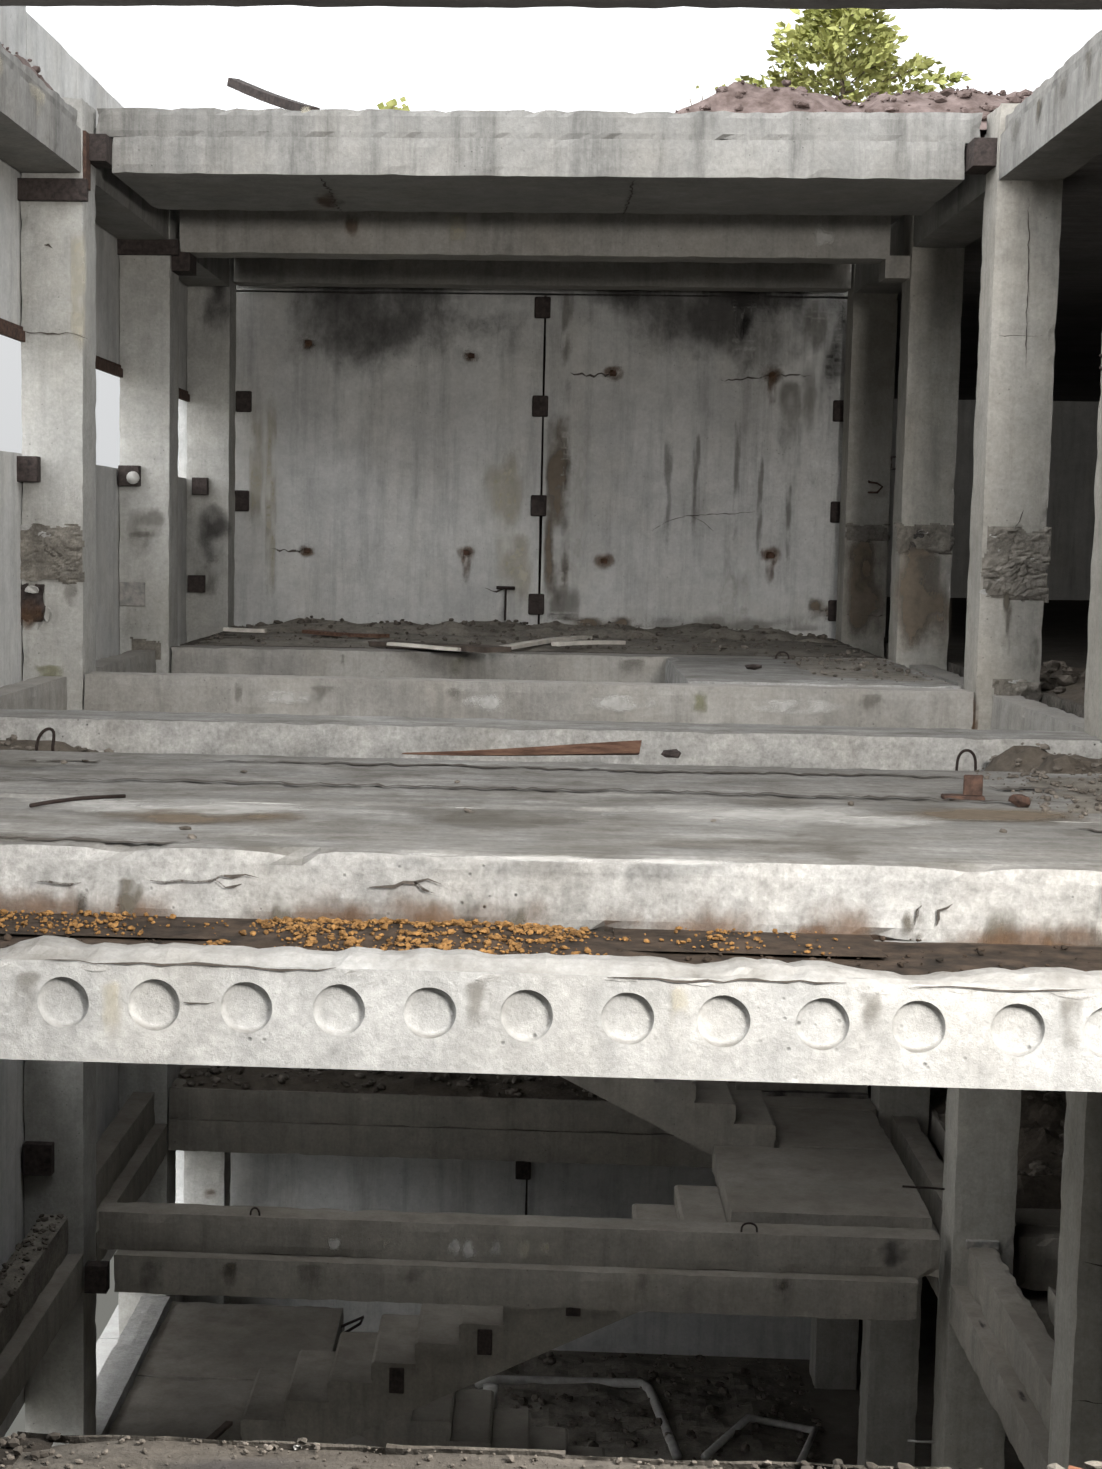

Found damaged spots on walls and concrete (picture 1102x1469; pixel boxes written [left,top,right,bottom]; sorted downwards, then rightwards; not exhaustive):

crack [999,200,1030,353]
damp [313,286,445,358]
damp [599,290,803,346]
spalling [20,523,85,626]
rust [595,555,613,567]
rust [762,548,778,578]
damp [809,600,828,617]
damp [848,531,948,646]
spalling [979,526,1052,603]
crack [0,836,199,844]
crack [150,874,258,888]
crack [369,878,440,893]